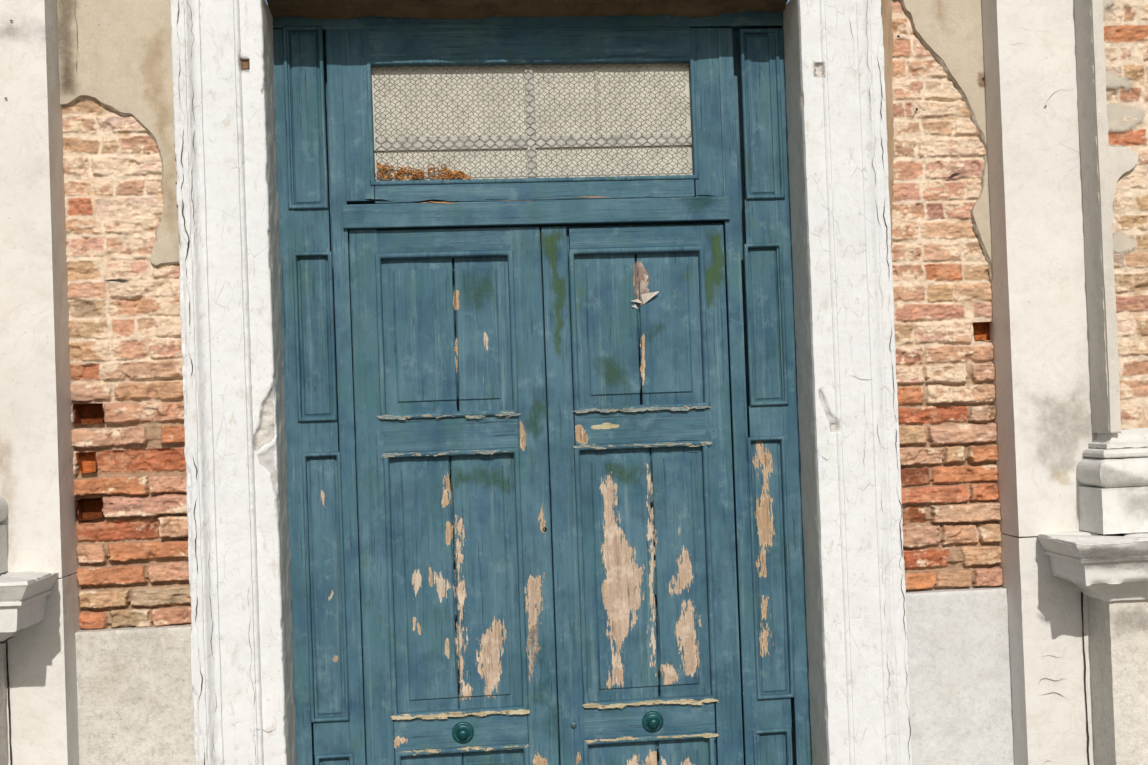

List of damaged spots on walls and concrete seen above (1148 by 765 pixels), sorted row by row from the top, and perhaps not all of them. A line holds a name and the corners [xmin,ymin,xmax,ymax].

peeling [1103,0,1148,429]
peeling [61,95,191,630]
peeling [632,261,659,309]
peeling [891,0,1005,591]
peeling [575,423,620,444]
peeling [411,471,507,702]
peeling [524,573,545,681]
peeling [599,465,702,689]
peeling [752,441,776,578]
peeling [759,595,774,658]
peeling [533,751,548,765]
peeling [627,750,666,765]